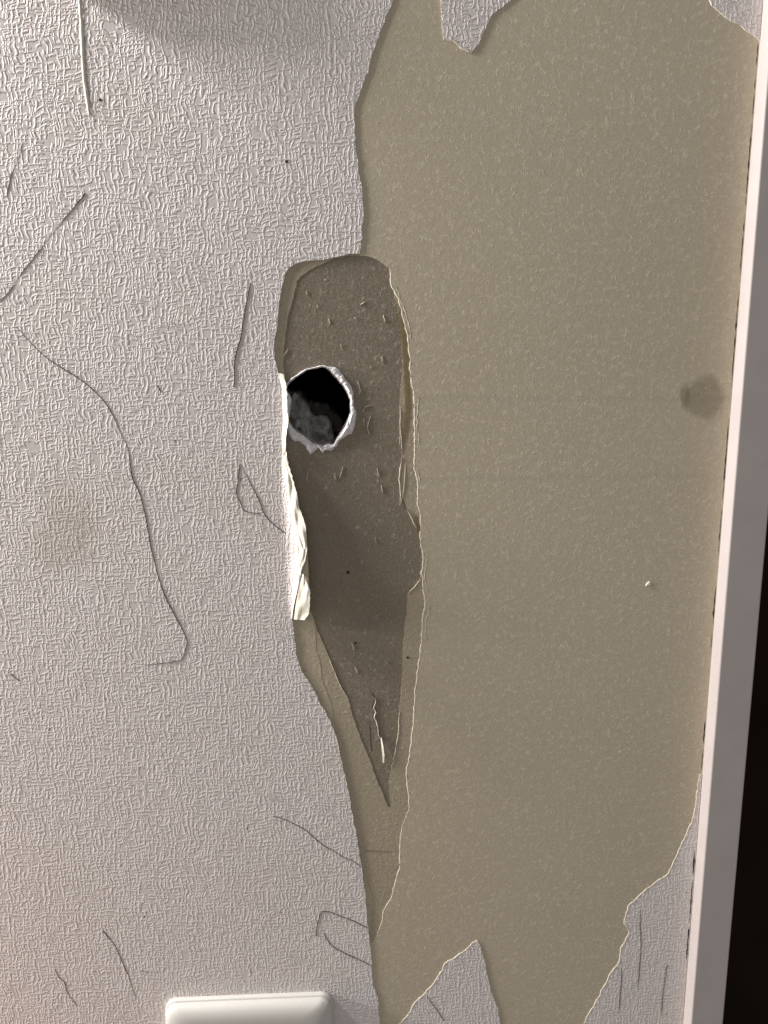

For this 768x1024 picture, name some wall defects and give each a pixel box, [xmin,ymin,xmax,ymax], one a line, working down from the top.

peeling [278,373,356,620]
peeling [354,0,763,1024]